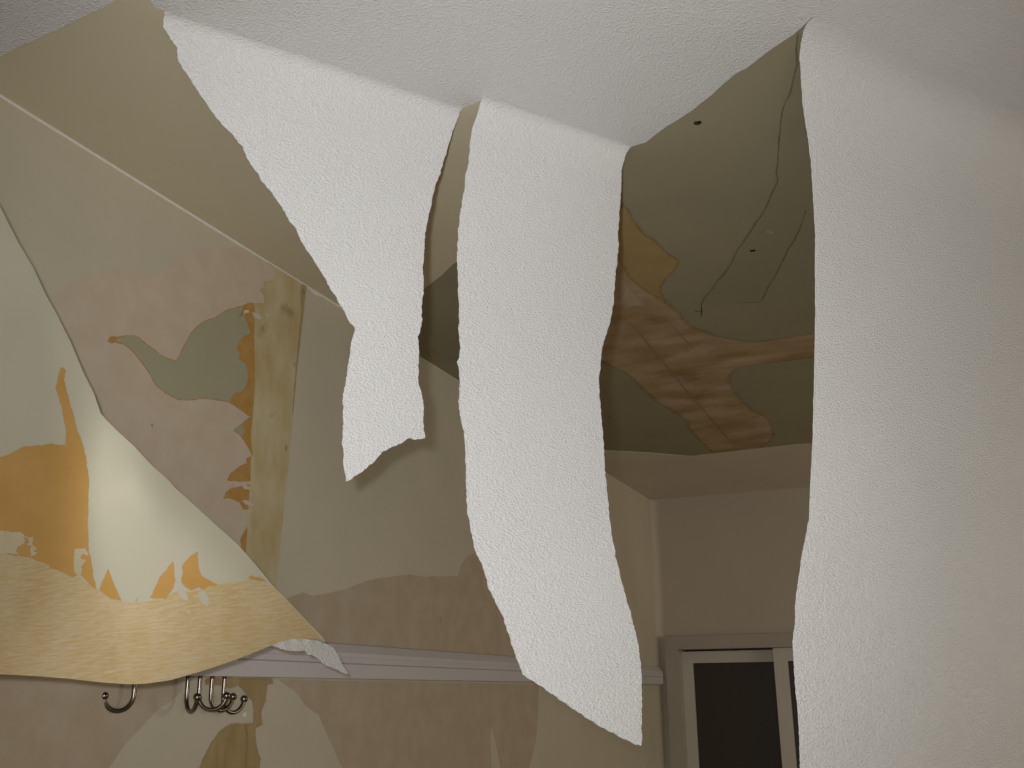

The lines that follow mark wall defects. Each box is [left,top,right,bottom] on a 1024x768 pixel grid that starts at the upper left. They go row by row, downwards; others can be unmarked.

peeling [163,11,463,481]
peeling [0,97,642,768]
crack [696,34,806,317]
peeling [792,17,1024,768]